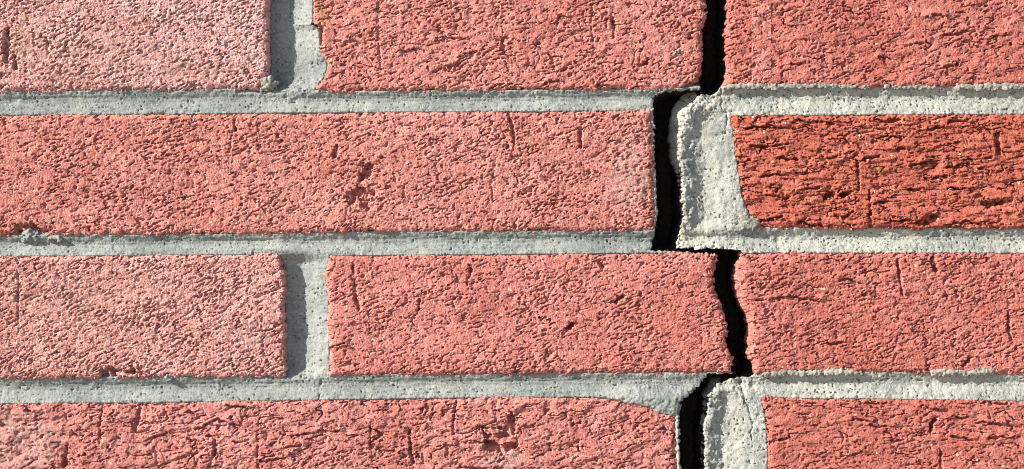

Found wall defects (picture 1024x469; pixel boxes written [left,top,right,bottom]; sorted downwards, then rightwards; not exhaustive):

crack [651,0,754,469]